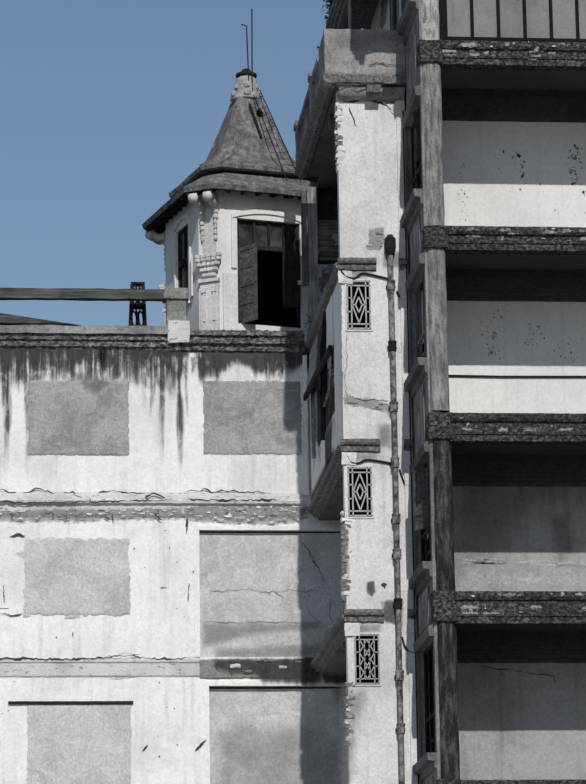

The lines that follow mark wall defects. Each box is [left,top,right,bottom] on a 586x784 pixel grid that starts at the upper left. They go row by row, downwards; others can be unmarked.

crack [327,62,401,127]
flaking render [334,100,354,174]
peeling [554,144,585,211]
peeling [366,227,386,250]
leakage [0,344,310,439]
peeling [0,505,309,533]
crack [204,542,333,626]
flaking render [340,511,352,603]
flaking render [344,682,356,747]